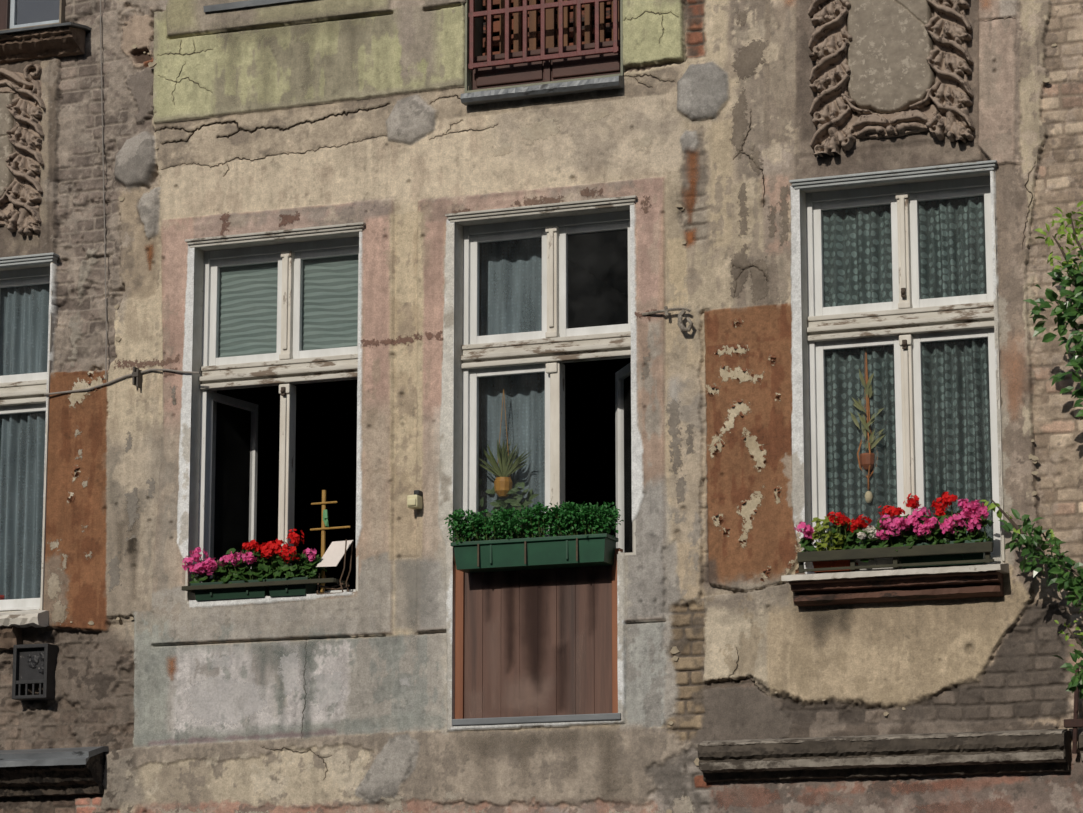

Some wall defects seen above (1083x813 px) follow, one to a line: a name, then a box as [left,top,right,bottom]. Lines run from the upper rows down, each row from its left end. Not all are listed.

spalling [50,0,179,408]
crack [158,40,212,100]
crack [155,103,390,176]
crack [430,94,498,139]
crack [733,113,765,207]
peeling [705,344,776,396]
spalling [751,0,1083,736]
peeling [707,399,767,472]
peeling [711,486,782,548]
spalling [0,538,136,752]
crack [262,639,332,780]
peeling [0,602,1083,813]